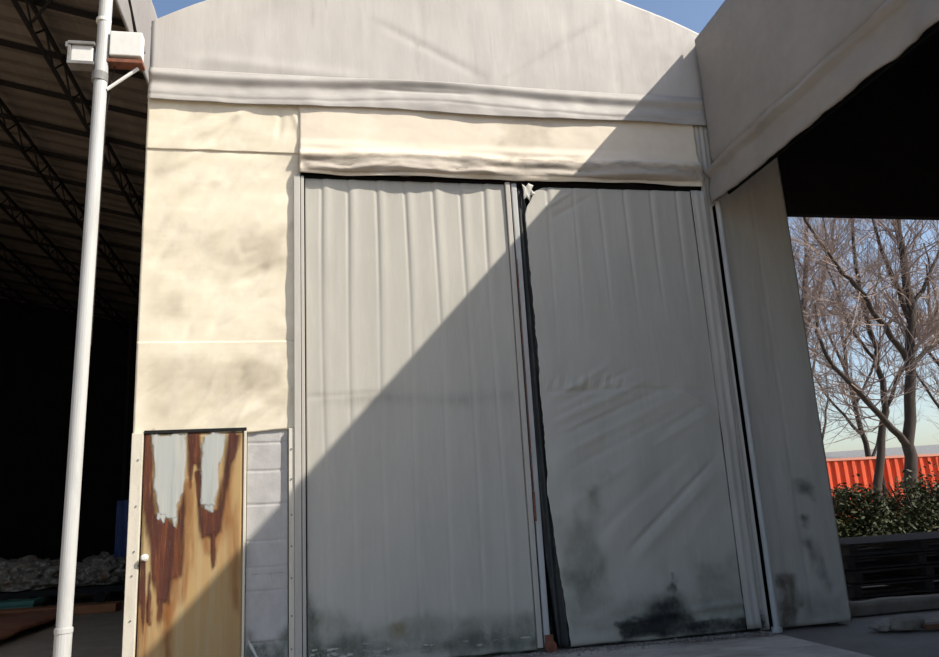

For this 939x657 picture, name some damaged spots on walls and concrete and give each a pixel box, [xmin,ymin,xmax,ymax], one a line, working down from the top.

corrosion [139,431,240,638]
water stain [618,584,747,645]